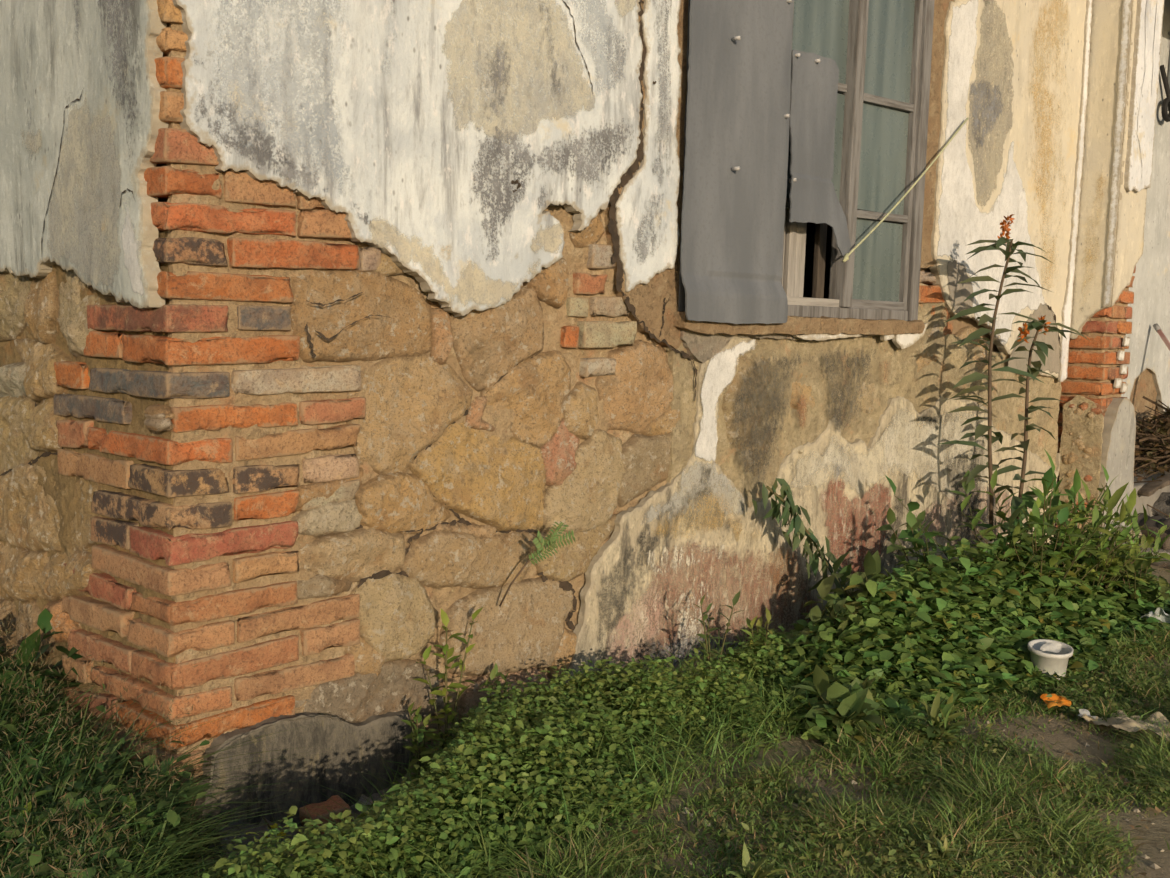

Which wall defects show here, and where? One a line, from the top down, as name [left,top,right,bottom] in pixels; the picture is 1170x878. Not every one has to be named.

crack [41,90,83,257]
leakage [472,118,632,260]
crack [608,0,697,404]
spalling [920,0,954,268]
peeling [938,0,1057,344]
spalling [0,0,688,859]
leakage [596,467,743,672]
spalling [647,271,989,522]
peeling [791,407,1011,573]
leakage [922,413,985,553]
spalling [992,266,1136,470]
spalling [1130,369,1160,423]